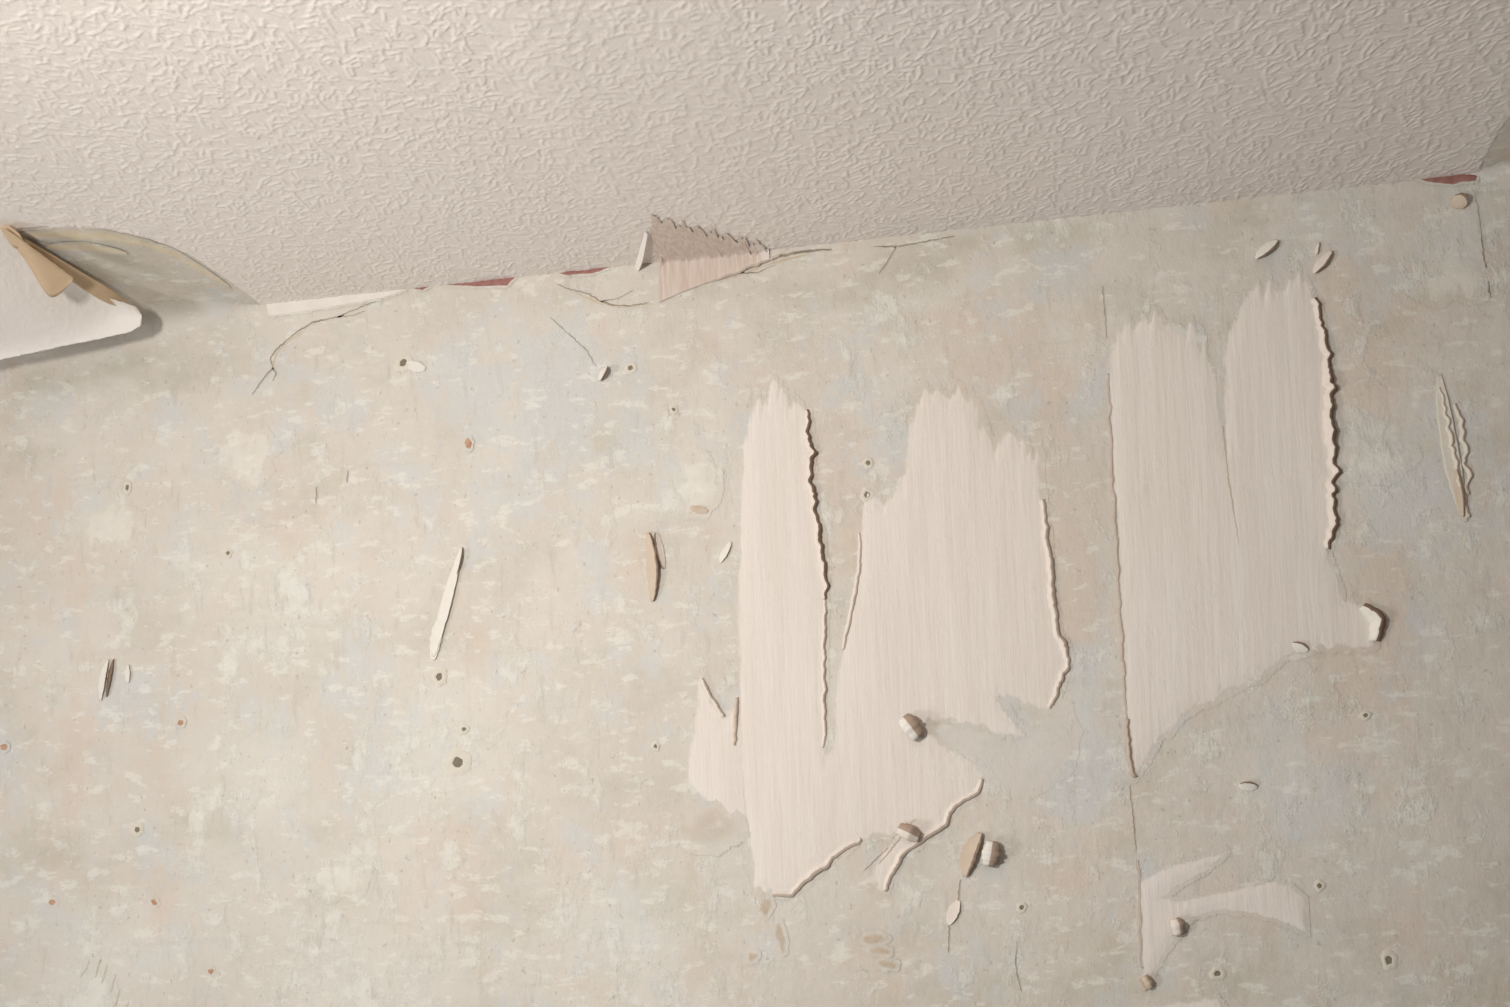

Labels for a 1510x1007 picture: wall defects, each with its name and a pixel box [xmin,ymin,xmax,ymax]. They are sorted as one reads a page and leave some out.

peeling [1482,118,1510,168]
peeling [0,201,407,360]
peeling [1100,239,1387,785]
peeling [429,547,463,687]
peeling [681,374,1084,901]
peeling [946,832,1001,953]
peeling [1133,847,1326,1007]